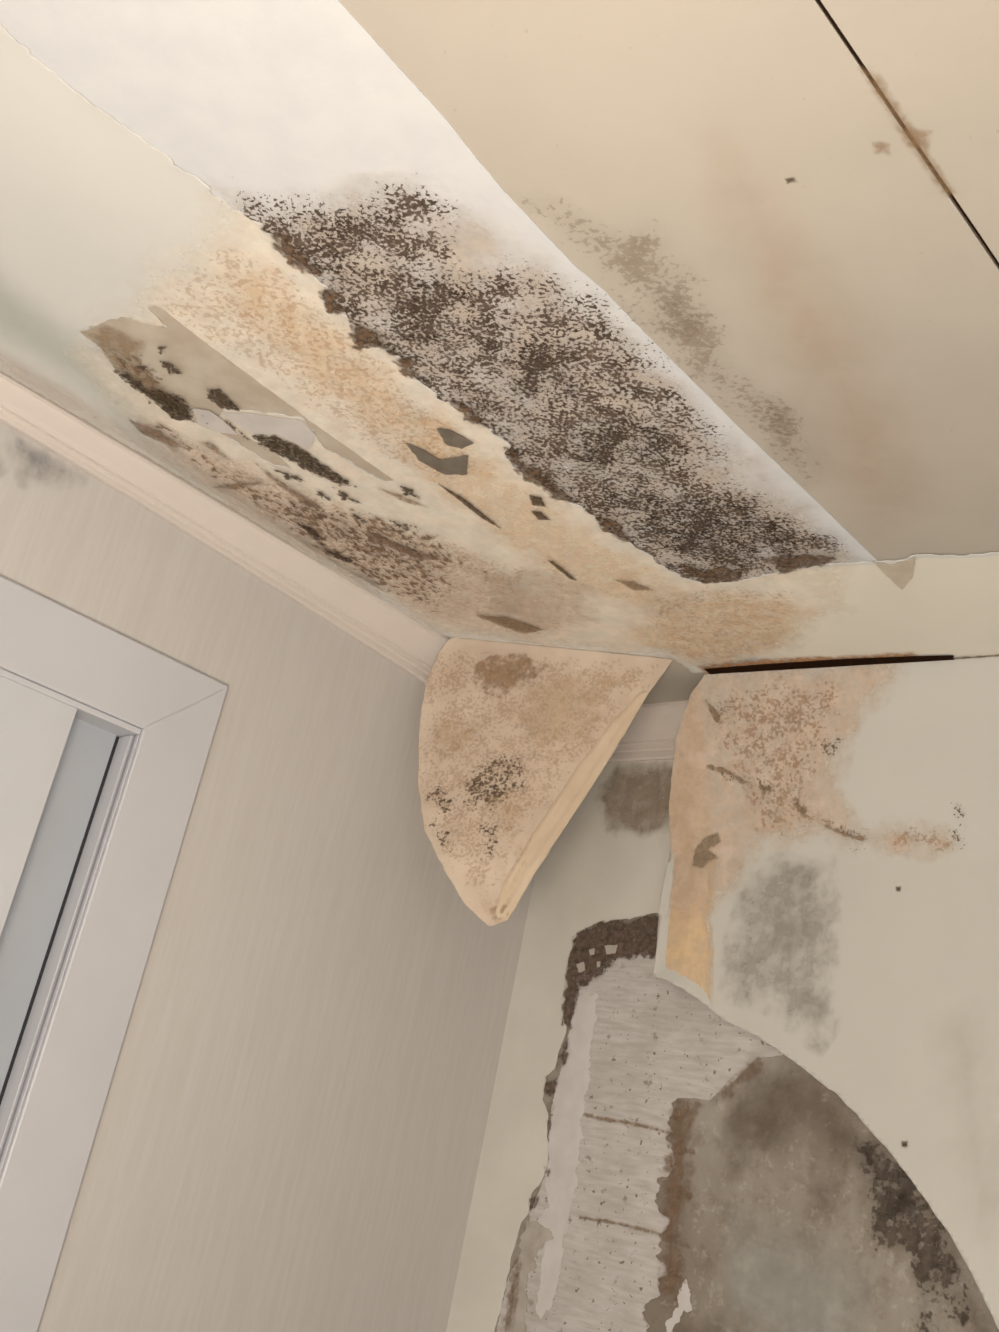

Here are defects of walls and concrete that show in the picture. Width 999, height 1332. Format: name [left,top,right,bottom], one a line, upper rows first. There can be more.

crack [816,0,999,267]
leakage [95,178,889,907]
crack [702,654,999,674]
leakage [561,914,659,1028]
spalling [544,1080,557,1096]
leakage [731,1242,850,1332]
leakage [834,1132,969,1332]